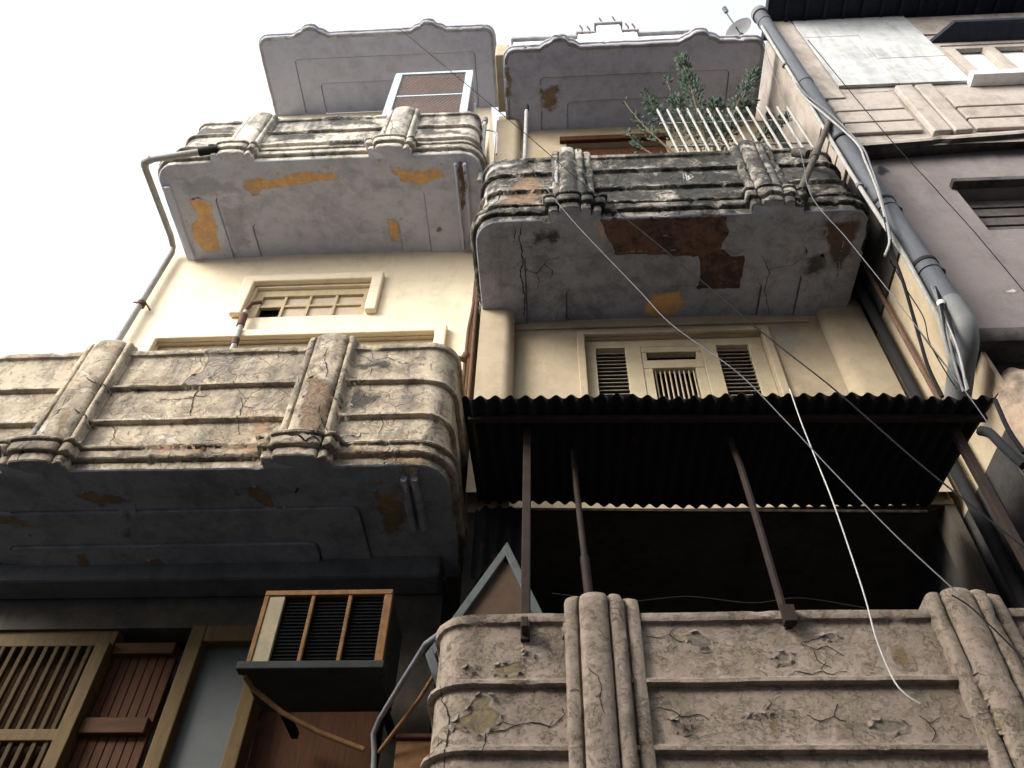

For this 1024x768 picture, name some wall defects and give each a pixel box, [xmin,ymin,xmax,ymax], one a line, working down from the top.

peeling [535,80,563,115]
peeling [241,165,342,199]
peeling [376,158,446,194]
peeling [183,197,227,256]
peeling [381,217,403,251]
crack [488,164,556,319]
spalling [593,215,748,318]
peeling [461,647,538,679]
crack [789,633,848,676]
peeling [431,690,506,750]